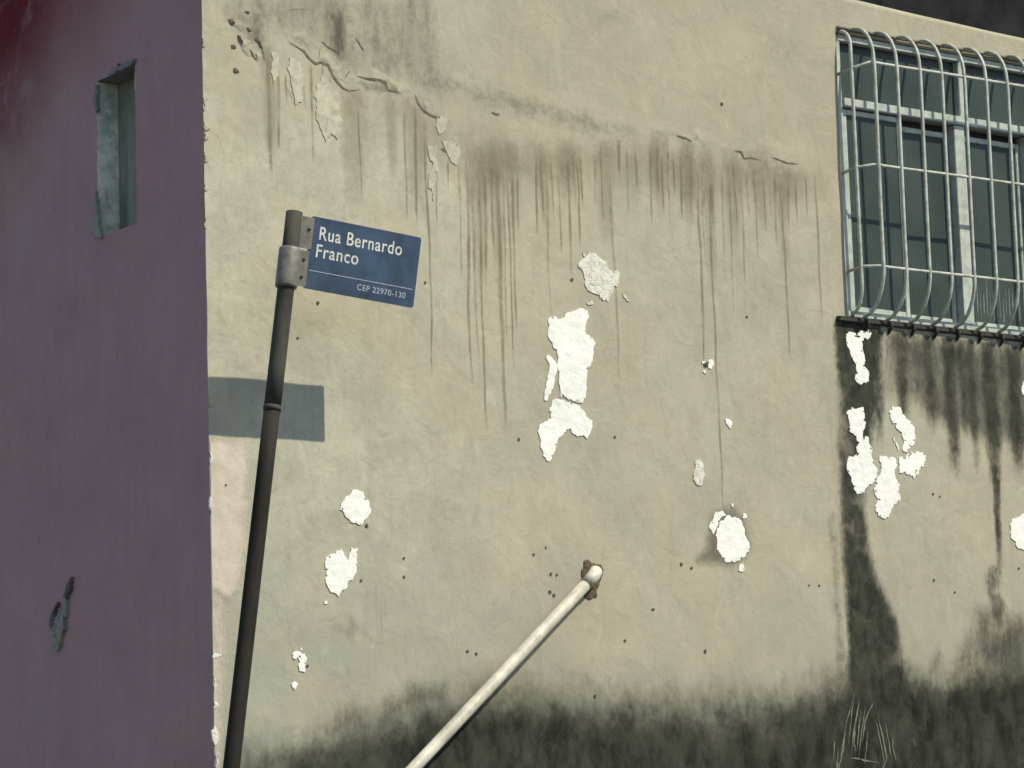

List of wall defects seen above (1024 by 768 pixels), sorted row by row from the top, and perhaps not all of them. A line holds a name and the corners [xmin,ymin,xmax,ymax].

peeling [228,11,343,141]
crack [292,38,449,121]
peeling [538,252,630,462]
peeling [846,330,872,385]
peeling [846,406,926,519]
peeling [324,548,363,604]
peeling [340,489,371,528]
water stain [290,322,1024,768]
peeling [704,503,750,572]
peeling [1009,514,1024,550]
peeling [49,577,74,651]
peeling [291,647,309,690]